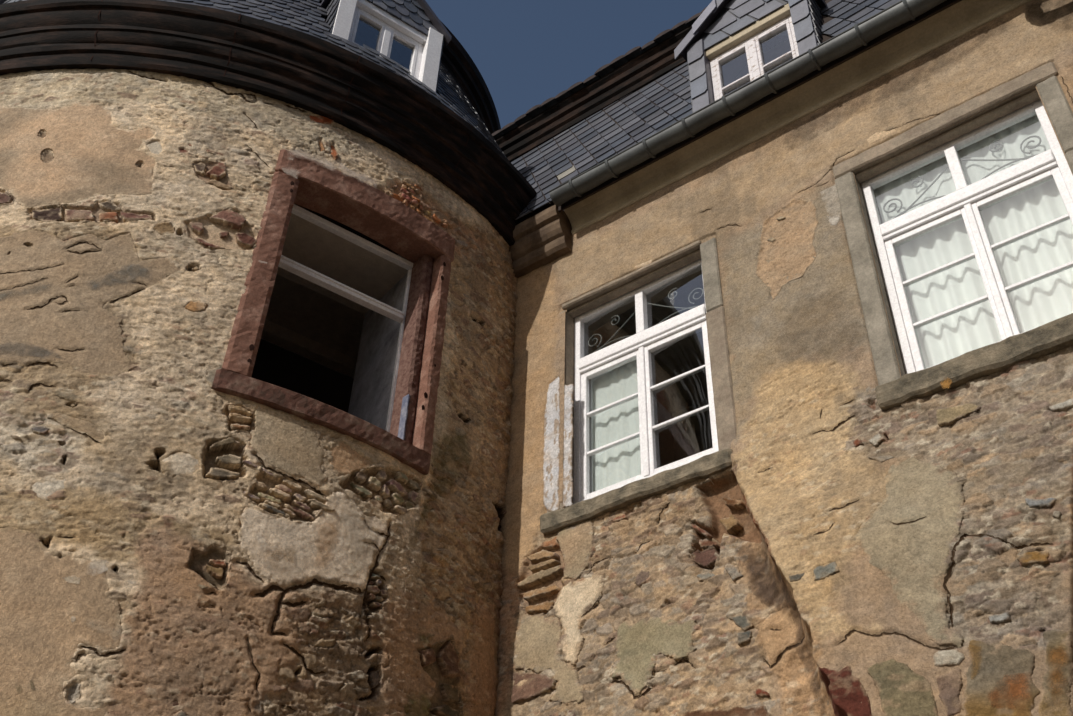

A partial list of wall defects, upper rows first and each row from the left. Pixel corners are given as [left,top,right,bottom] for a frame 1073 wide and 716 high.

peeling [0,102,260,250]
peeling [188,403,423,615]
crack [236,520,391,712]
spalling [348,647,383,702]
peeling [511,536,585,716]
peeling [543,377,574,512]
spalling [689,469,762,582]
flaking render [682,688,771,716]
peeling [728,607,801,660]
flaking render [789,561,840,582]
peeling [850,433,965,648]
crack [839,533,1053,651]